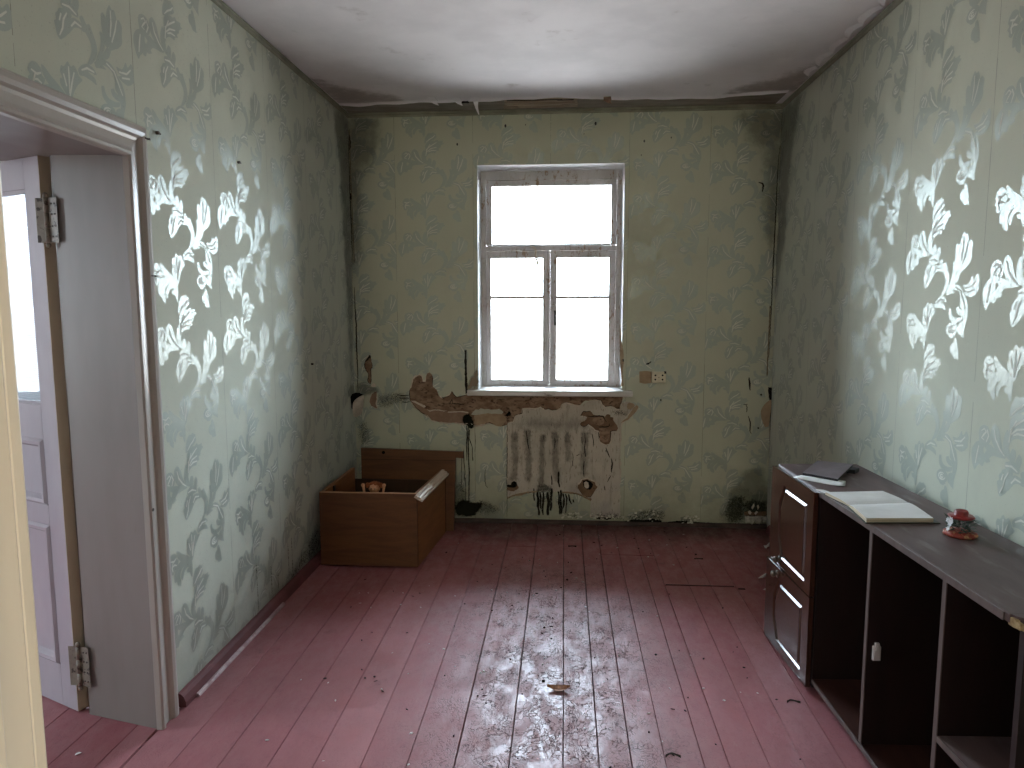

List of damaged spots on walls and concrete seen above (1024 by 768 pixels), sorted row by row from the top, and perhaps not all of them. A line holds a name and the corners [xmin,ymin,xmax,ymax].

peeling [412,399,511,428]
spalling [580,411,618,445]
water stain [533,472,574,515]